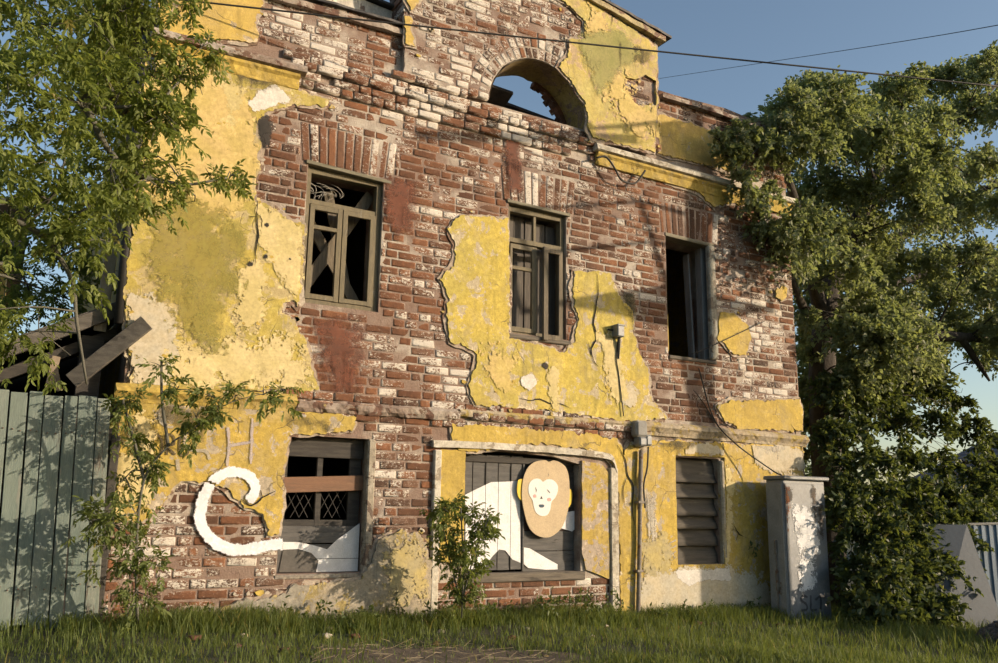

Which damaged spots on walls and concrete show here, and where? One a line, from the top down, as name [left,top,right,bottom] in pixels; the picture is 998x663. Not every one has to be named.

water stain [143,192,250,356]
flaking render [103,0,798,622]
crack [588,275,599,366]
peeling [752,443,807,475]
peeling [810,484,825,540]